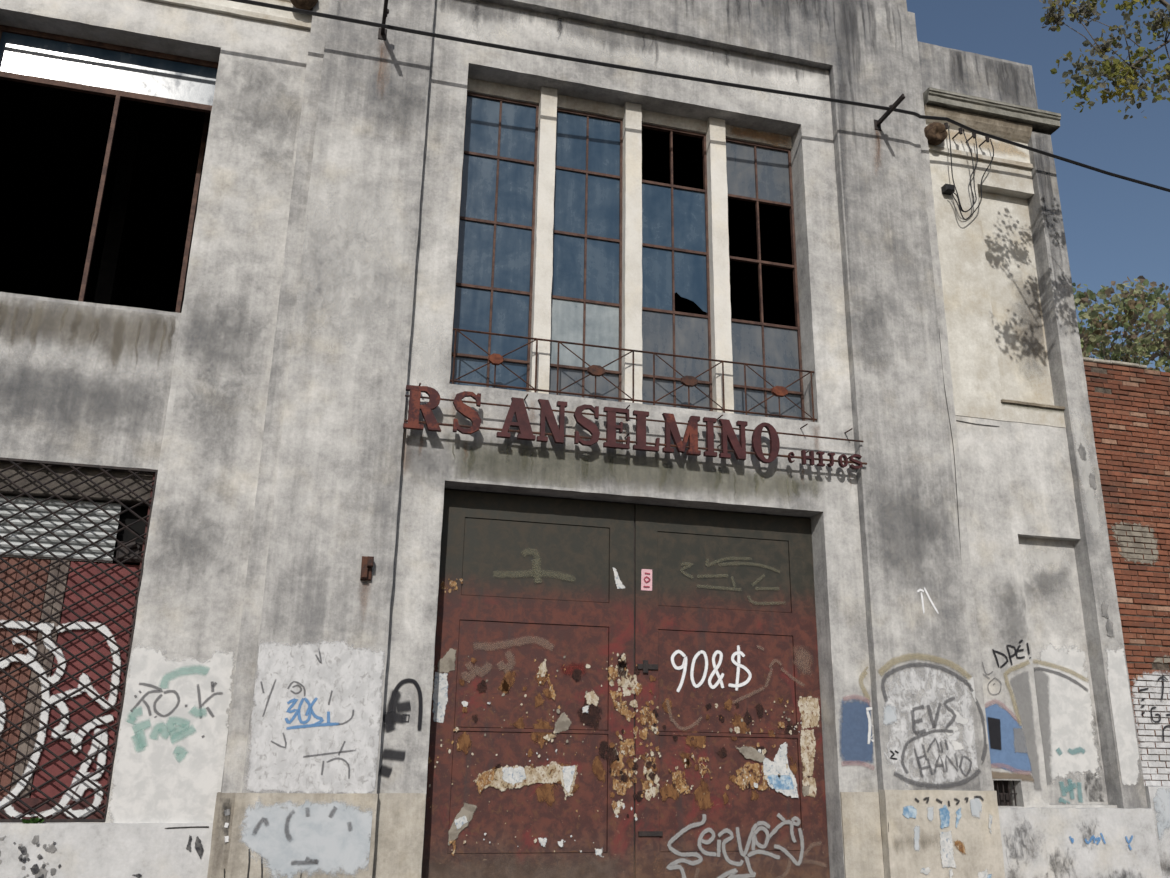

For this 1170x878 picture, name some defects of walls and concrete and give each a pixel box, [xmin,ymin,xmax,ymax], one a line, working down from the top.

peeling [428,648,817,821]
spalling [0,835,61,878]
peeling [449,816,490,856]